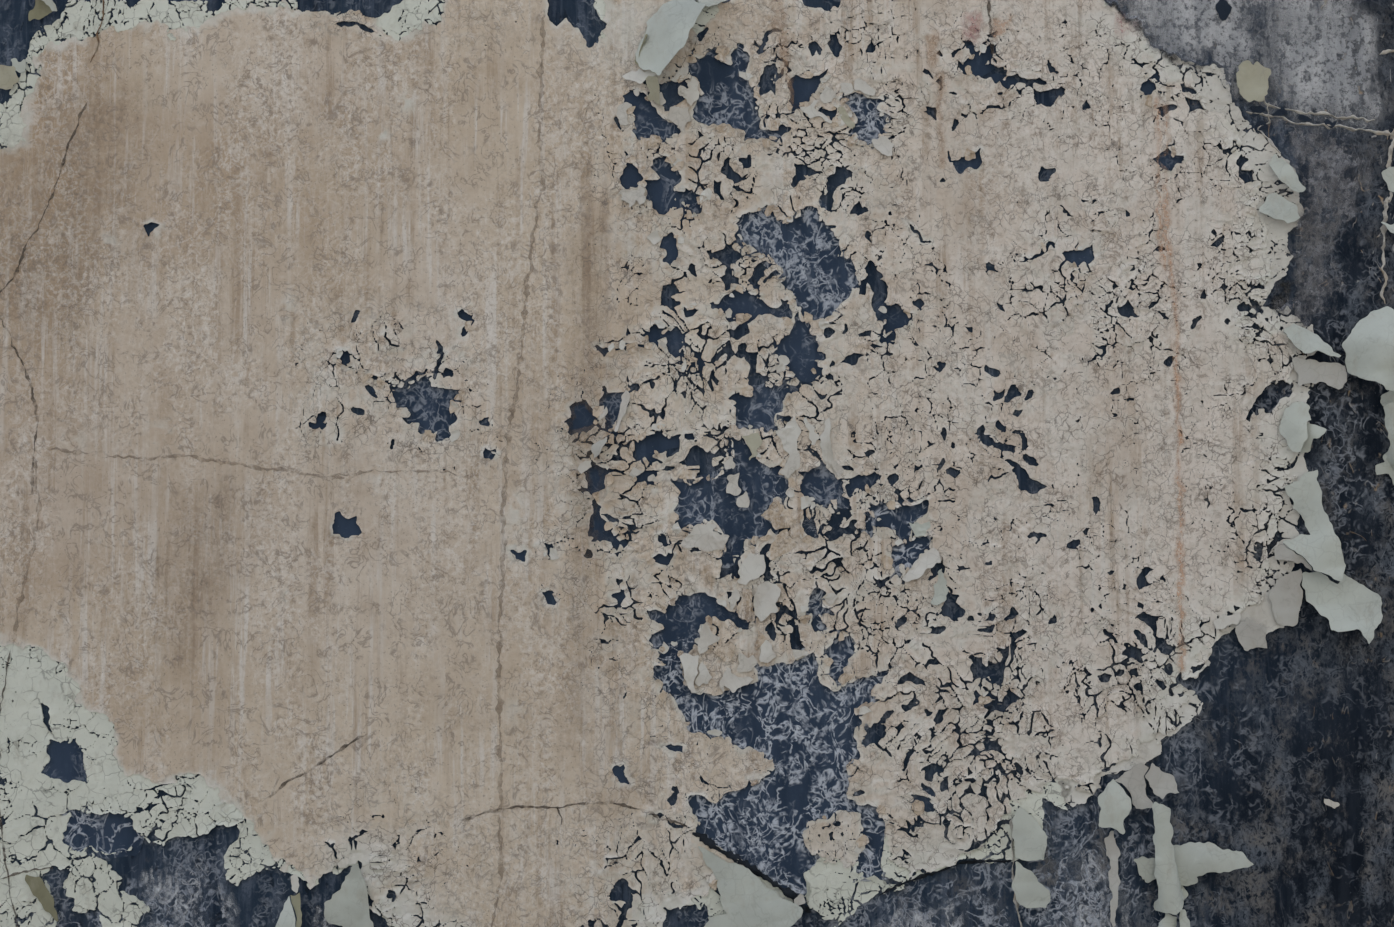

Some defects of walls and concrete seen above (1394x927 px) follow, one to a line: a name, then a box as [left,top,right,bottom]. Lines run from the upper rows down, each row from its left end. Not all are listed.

peeling [0,0,298,149]
peeling [370,0,445,41]
crack [1246,97,1394,303]
crack [0,103,87,491]
peeling [457,307,475,337]
peeling [305,415,327,433]
peeling [330,348,497,460]
peeling [561,0,1394,927]
peeling [332,511,362,538]
crack [0,652,10,712]
peeling [0,644,392,927]
crack [0,812,52,927]